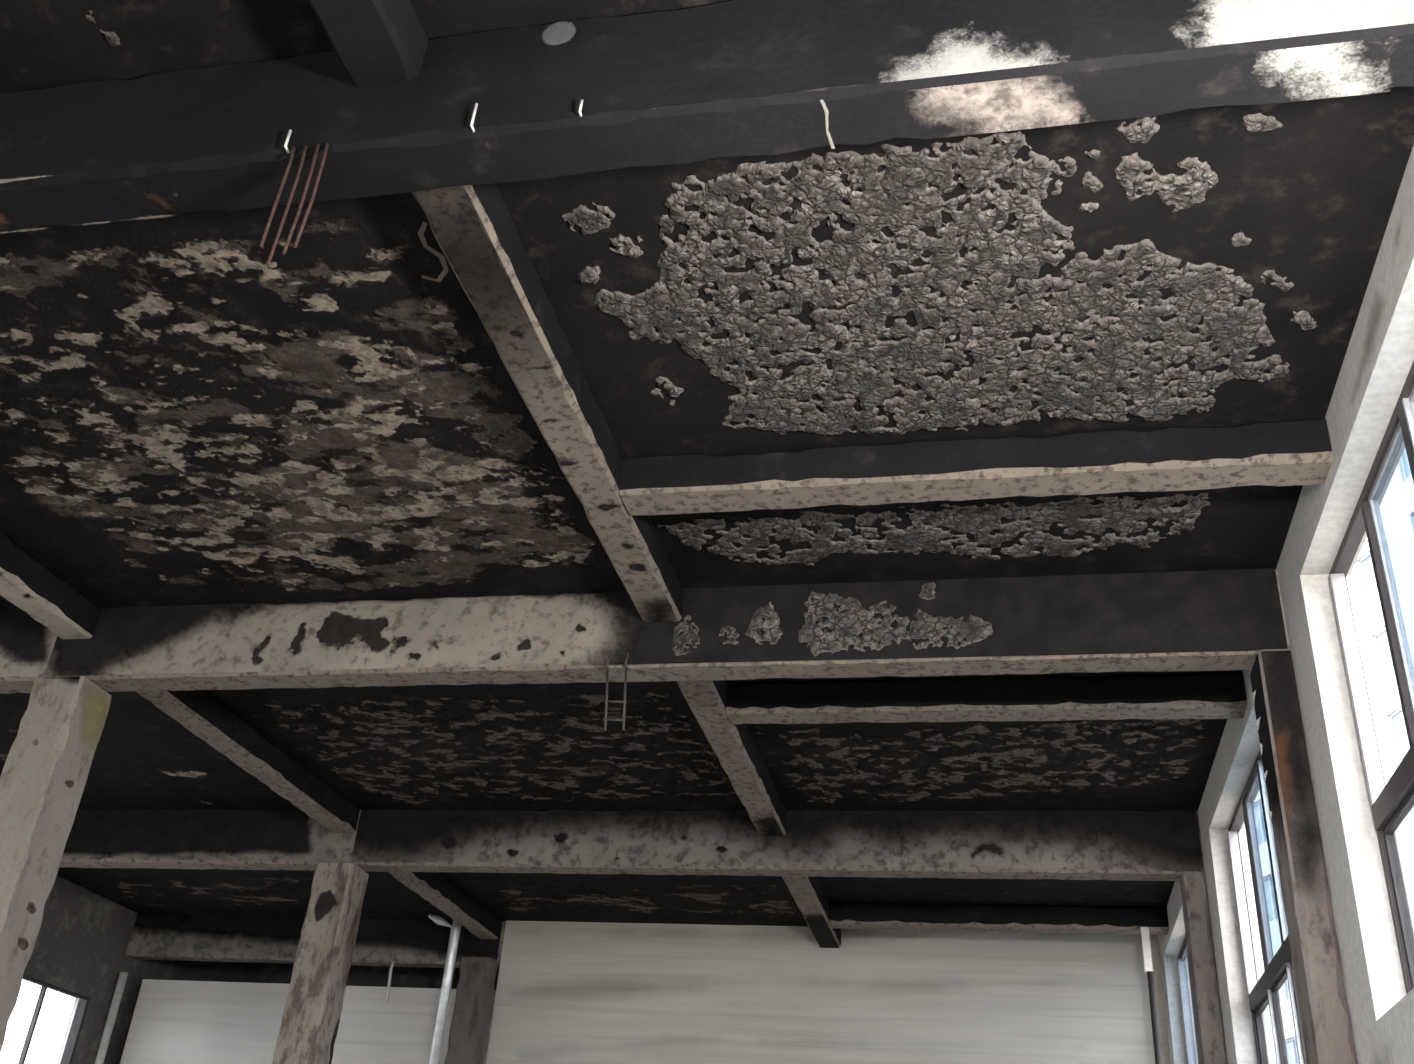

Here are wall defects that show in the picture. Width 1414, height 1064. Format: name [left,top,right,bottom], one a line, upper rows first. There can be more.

flaking render [85,9,120,46]
flaking render [562,34,1294,435]
flaking render [1290,310,1317,331]
flaking render [0,219,596,592]
flaking render [656,492,1210,566]
flaking render [672,615,700,656]
flaking render [719,582,993,657]
flaking render [266,692,736,805]
flaking render [757,719,1210,805]